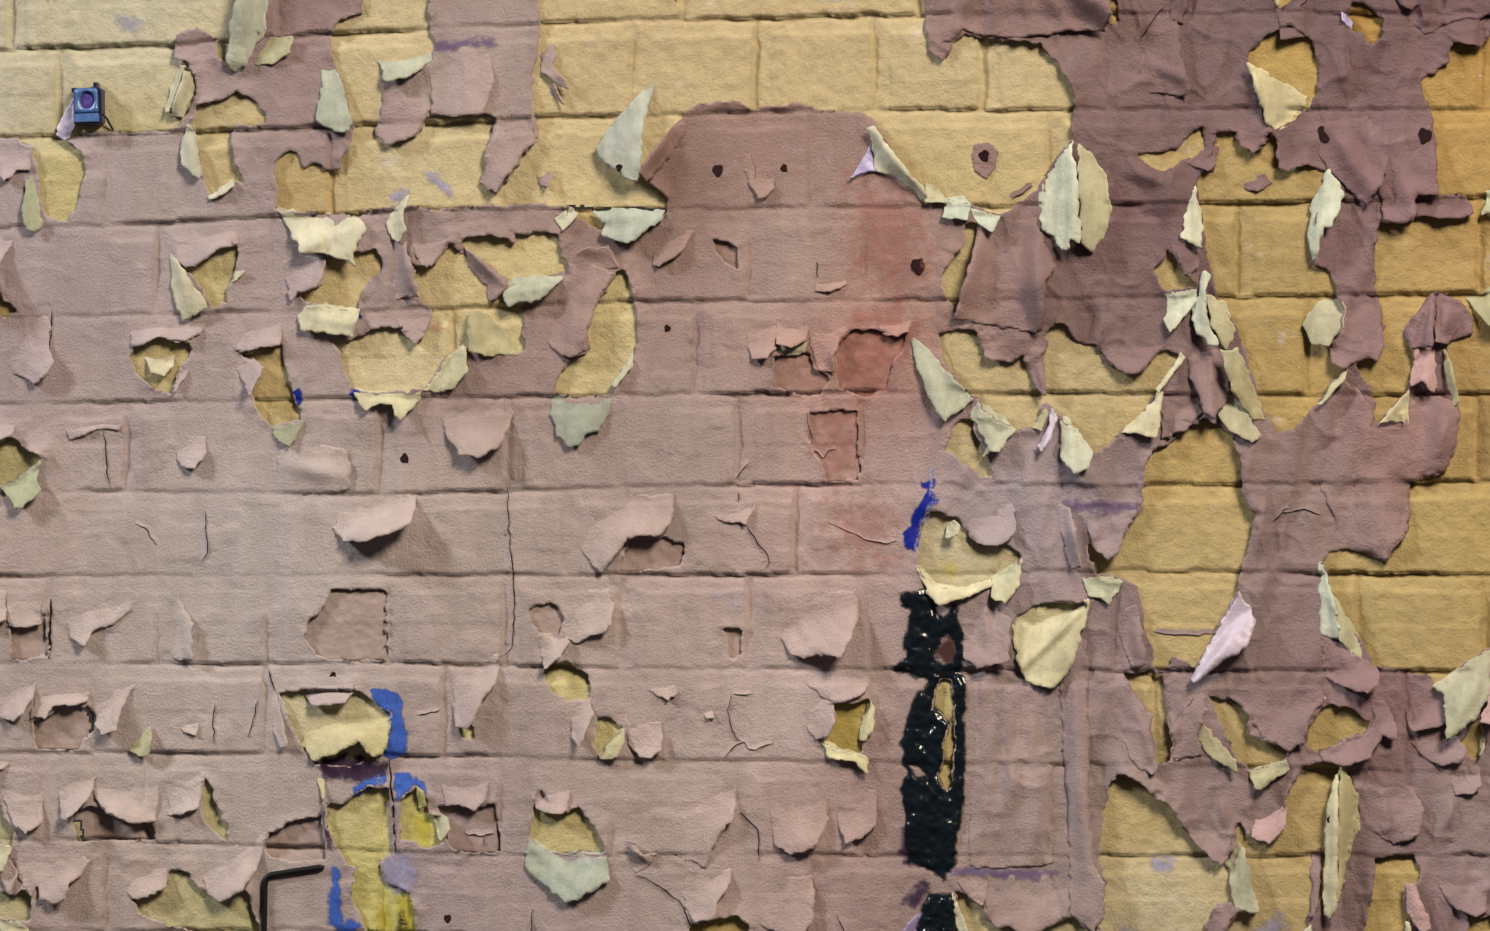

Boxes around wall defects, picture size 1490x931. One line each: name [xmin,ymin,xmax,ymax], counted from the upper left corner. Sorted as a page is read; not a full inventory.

peeling [274,0,1112,448]
peeling [130,230,245,394]
peeling [231,321,304,448]
peeling [332,492,417,543]
peeling [440,398,514,458]
peeling [911,0,1490,931]
peeling [0,590,48,660]
peeling [451,653,500,740]
peeling [529,494,685,760]
peeling [769,590,877,855]
peeling [0,682,501,931]
peeling [525,785,815,931]